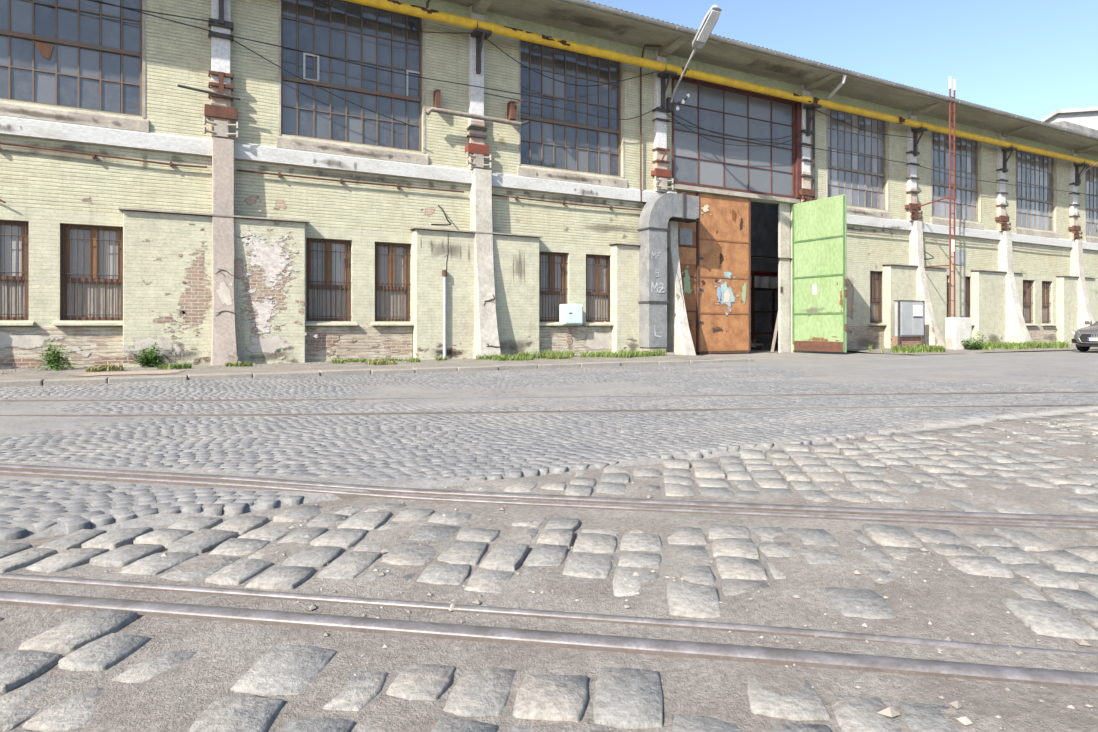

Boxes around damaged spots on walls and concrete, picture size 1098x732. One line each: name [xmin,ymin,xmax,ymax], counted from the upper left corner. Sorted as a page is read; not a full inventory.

flaking render [151,195,356,362]
peeling [714,271,748,315]
flaking render [0,357,46,369]
flaking render [60,345,147,367]
flaking render [370,338,462,358]